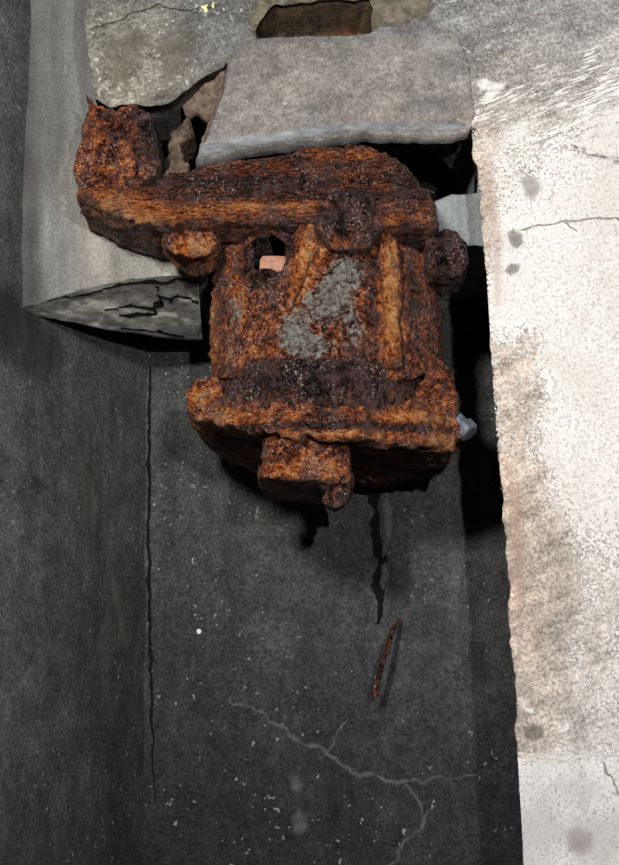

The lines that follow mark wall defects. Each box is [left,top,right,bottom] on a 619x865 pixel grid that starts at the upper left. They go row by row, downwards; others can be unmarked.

spalling [90,3,227,143]
crack [519,217,619,231]
crack [145,366,155,802]
rust [318,482,351,512]
crack [368,485,396,624]
crack [230,701,488,865]